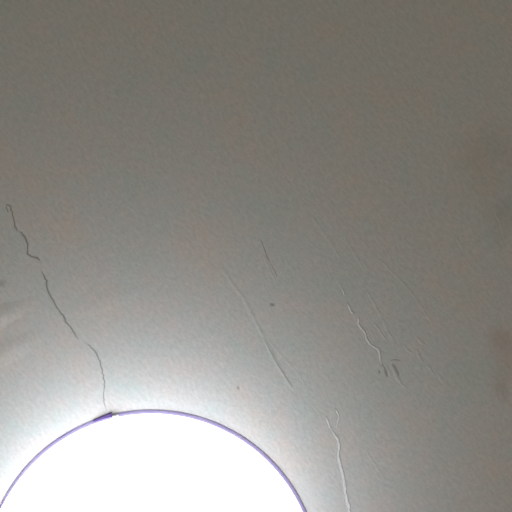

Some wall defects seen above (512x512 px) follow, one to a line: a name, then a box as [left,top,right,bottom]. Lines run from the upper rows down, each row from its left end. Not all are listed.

crack [340,285,406,389]
crack [326,409,351,512]